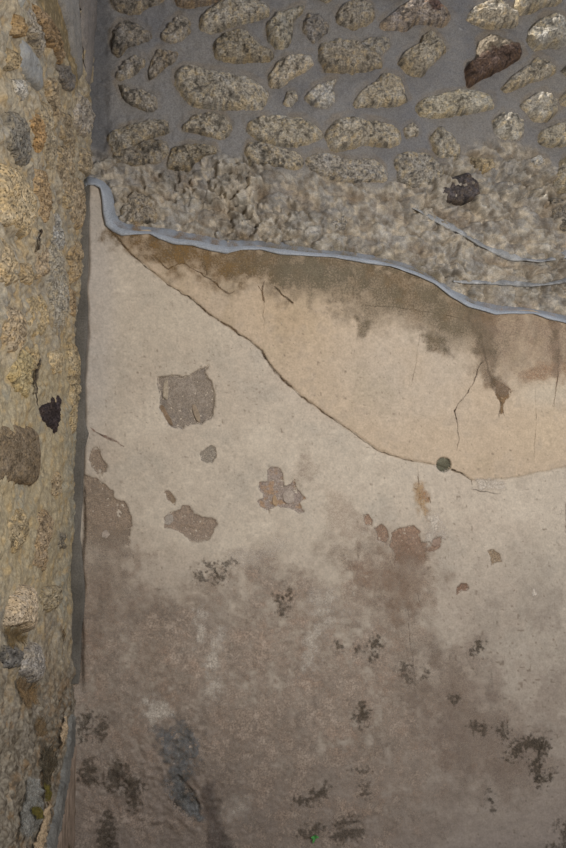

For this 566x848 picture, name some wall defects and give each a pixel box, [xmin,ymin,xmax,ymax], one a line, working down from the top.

crack [115,235,333,419]
leakage [101,222,566,395]
spalling [158,367,215,429]
spalling [83,448,132,543]
spalling [164,491,218,541]
spalling [258,467,306,513]
spalling [364,514,441,561]
leakage [73,545,552,848]